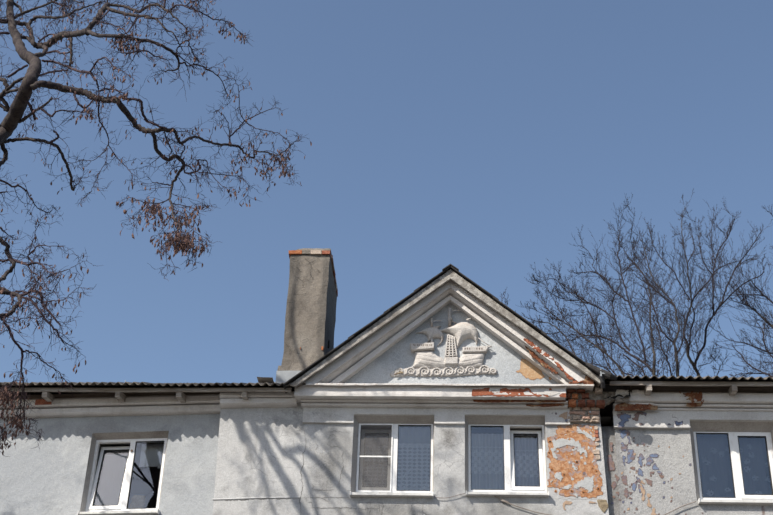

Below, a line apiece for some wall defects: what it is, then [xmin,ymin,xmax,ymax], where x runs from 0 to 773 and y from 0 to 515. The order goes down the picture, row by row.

crack [215,428,383,515]
peeling [472,358,681,515]